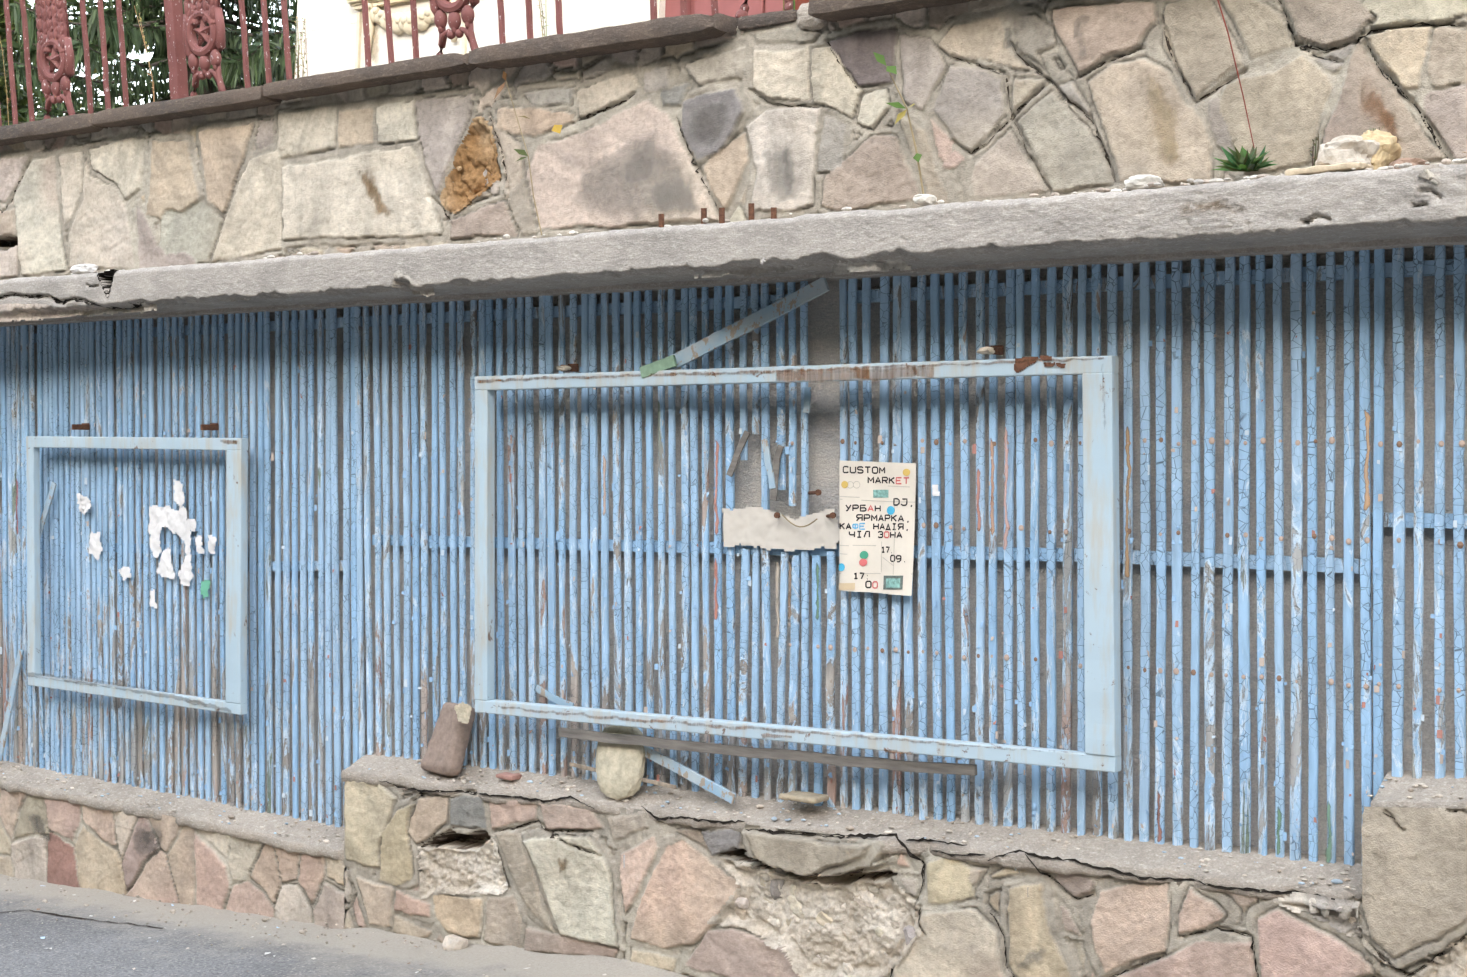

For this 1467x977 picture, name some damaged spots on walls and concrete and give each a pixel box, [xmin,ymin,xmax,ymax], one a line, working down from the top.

peeling [0,269,157,322]
corrosion [965,355,1101,373]
peeling [1121,422,1335,600]
peeling [1364,411,1420,511]
peeling [1438,520,1464,558]
peeling [10,536,338,820]
peeling [469,718,595,770]
peeling [853,605,1082,705]
peeling [1127,651,1298,710]
peeling [1327,643,1465,764]
peeling [1110,750,1176,842]
peeling [1277,754,1377,863]